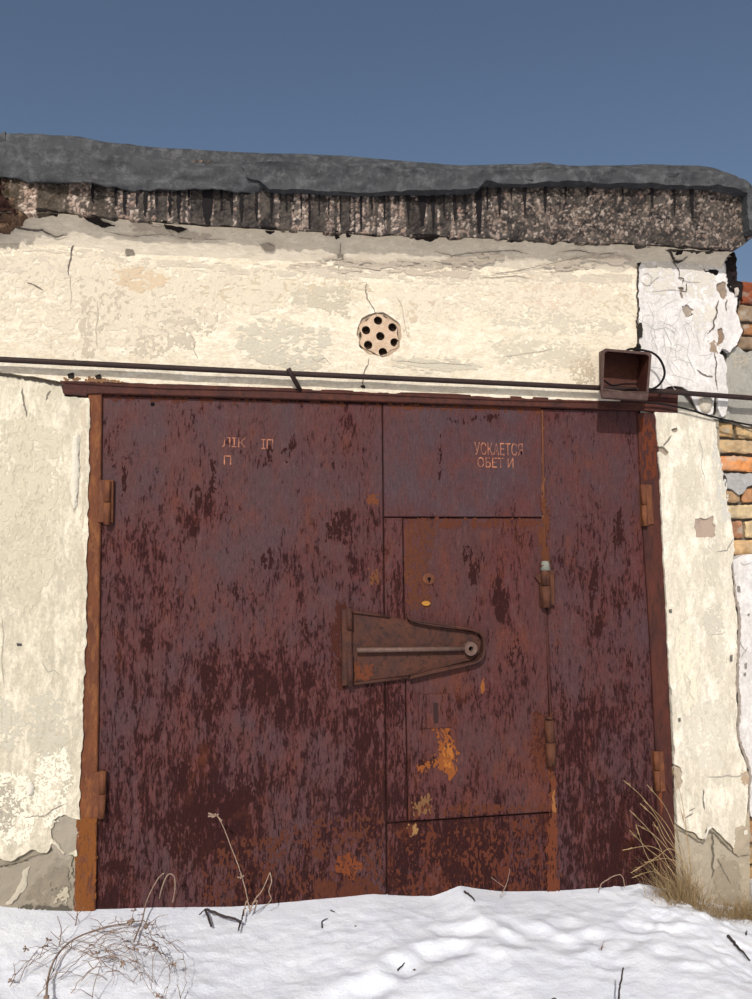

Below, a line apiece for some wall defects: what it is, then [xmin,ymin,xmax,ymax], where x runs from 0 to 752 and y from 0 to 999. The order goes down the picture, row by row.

spalling [0,177,28,235]
crack [403,242,733,390]
spalling [708,328,723,353]
spalling [716,282,726,299]
rust [103,395,345,407]
rust [361,402,541,414]
rust [639,417,657,481]
rust [330,599,374,693]
spalling [0,747,79,911]
rust [75,816,99,912]
rust [194,705,562,907]
spalling [676,825,752,908]